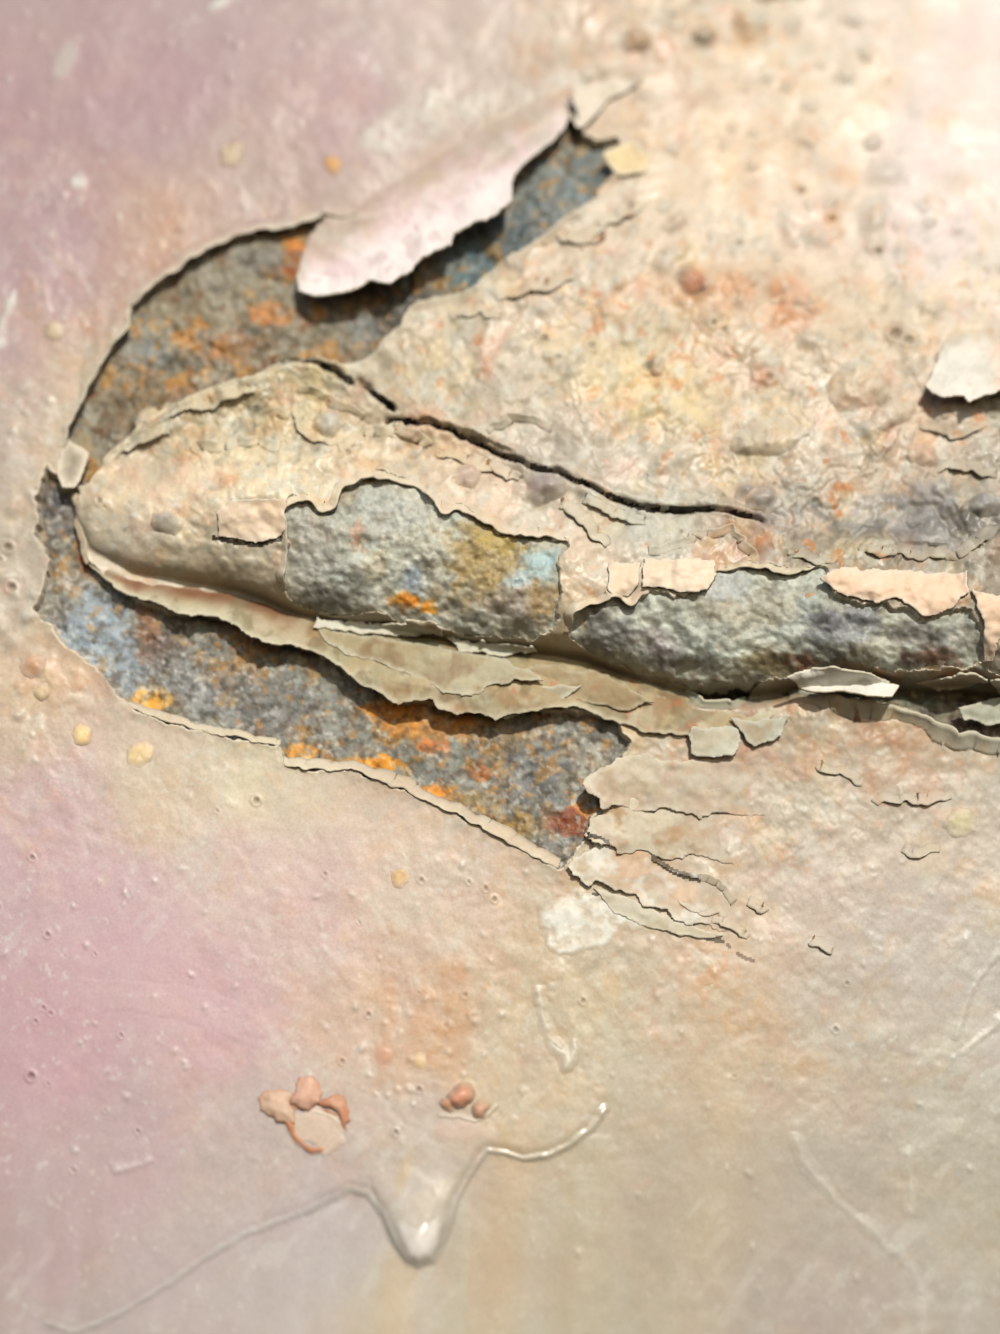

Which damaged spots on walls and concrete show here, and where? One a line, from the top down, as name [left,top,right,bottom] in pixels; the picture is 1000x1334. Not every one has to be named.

peeling [37,65,1000,957]
crack [285,360,762,522]
rust [0,620,99,725]